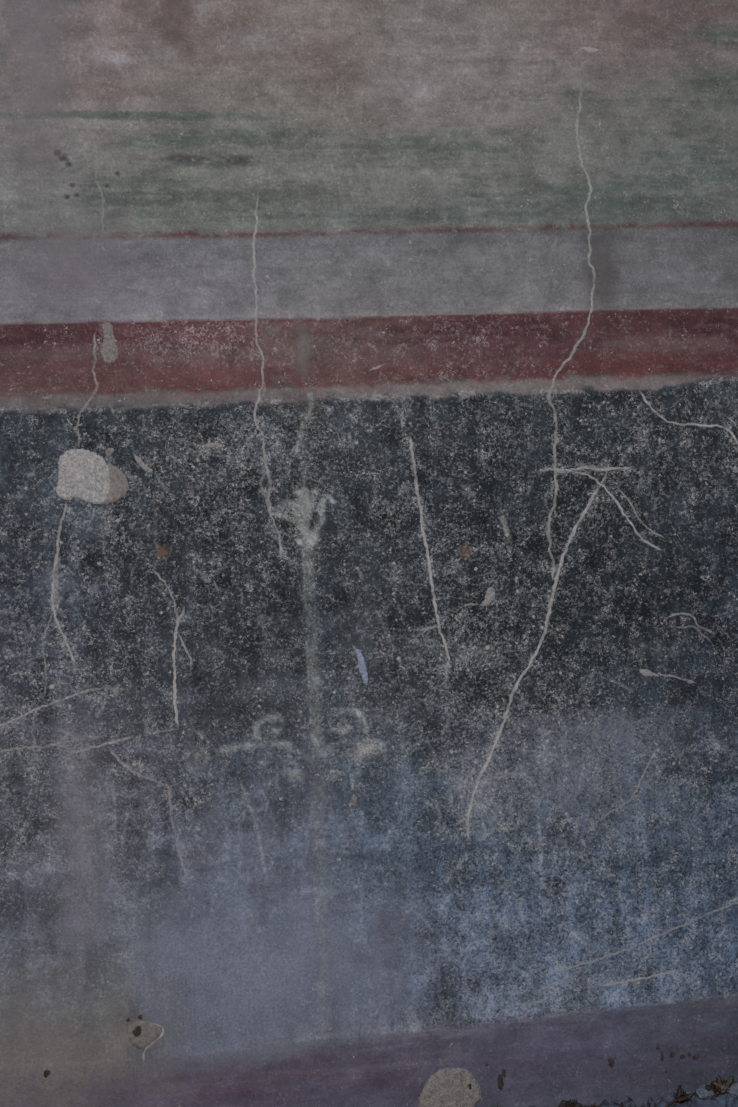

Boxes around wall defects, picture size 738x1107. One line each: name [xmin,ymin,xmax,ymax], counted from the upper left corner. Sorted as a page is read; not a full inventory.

crack [45,505,75,662]
crack [78,336,113,442]
crack [252,198,283,553]
crack [401,420,450,661]
crack [466,93,661,838]
crack [641,393,737,442]